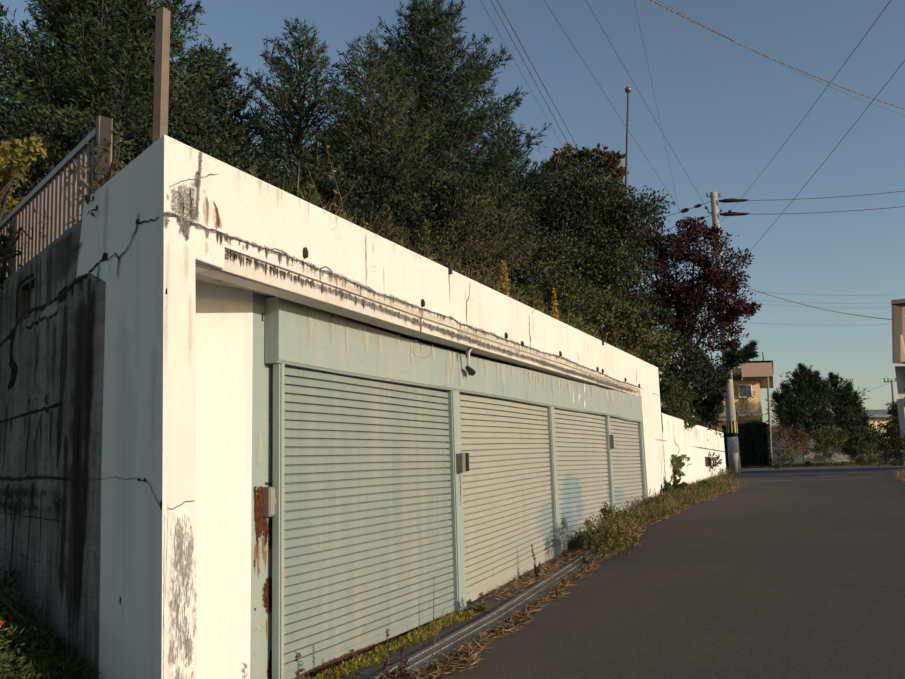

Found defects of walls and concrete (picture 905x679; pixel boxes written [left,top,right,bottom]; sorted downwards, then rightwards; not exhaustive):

leakage [165,152,202,240]
corrosion [204,190,229,244]
crack [0,174,680,454]
leakage [205,230,638,408]
leakage [0,233,96,621]
crack [92,477,195,679]
corrosion [254,482,272,635]